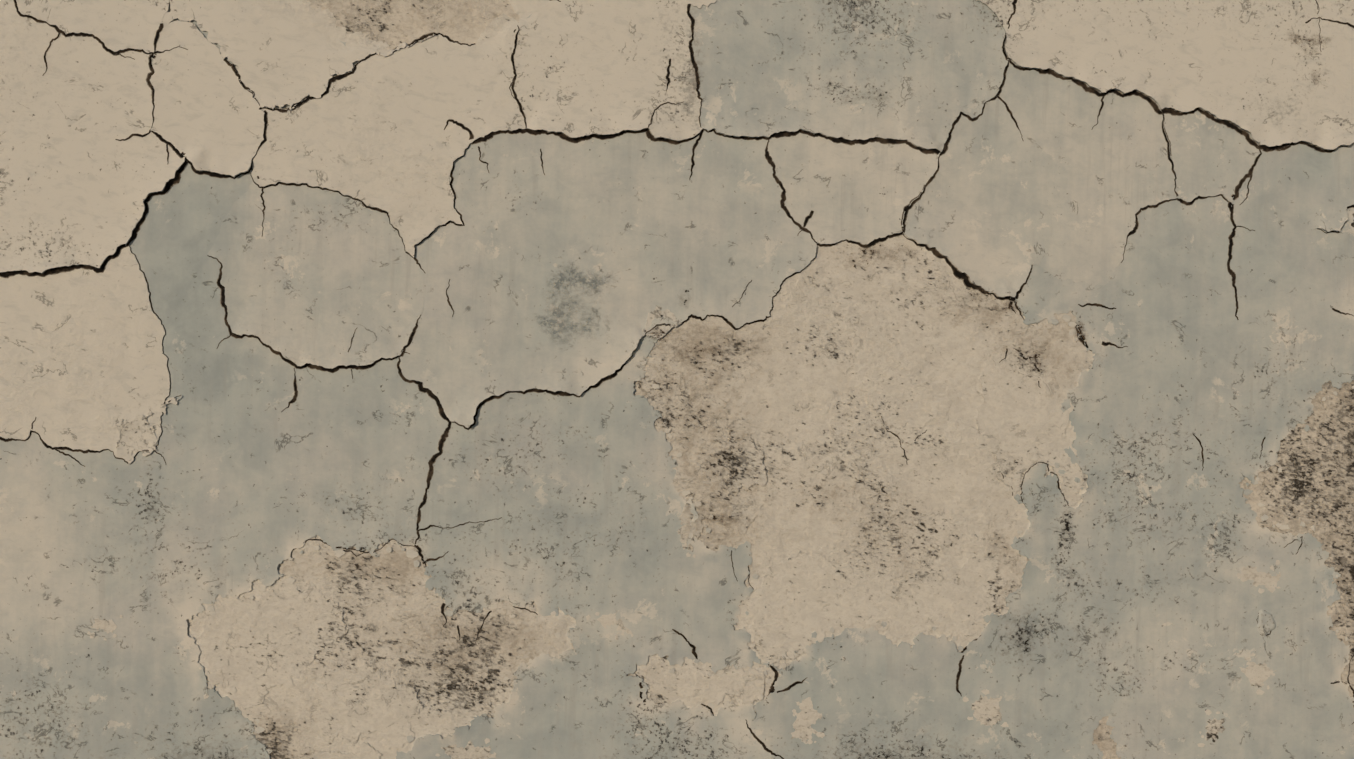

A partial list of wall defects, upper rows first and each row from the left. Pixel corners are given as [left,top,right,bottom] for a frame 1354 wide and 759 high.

peeling [0,0,817,464]
crack [0,0,1354,566]
spalling [627,0,1354,720]
spalling [189,535,577,759]
crack [731,546,753,588]
peeling [791,697,825,744]
peeling [962,689,1009,727]
peeling [1197,709,1226,747]